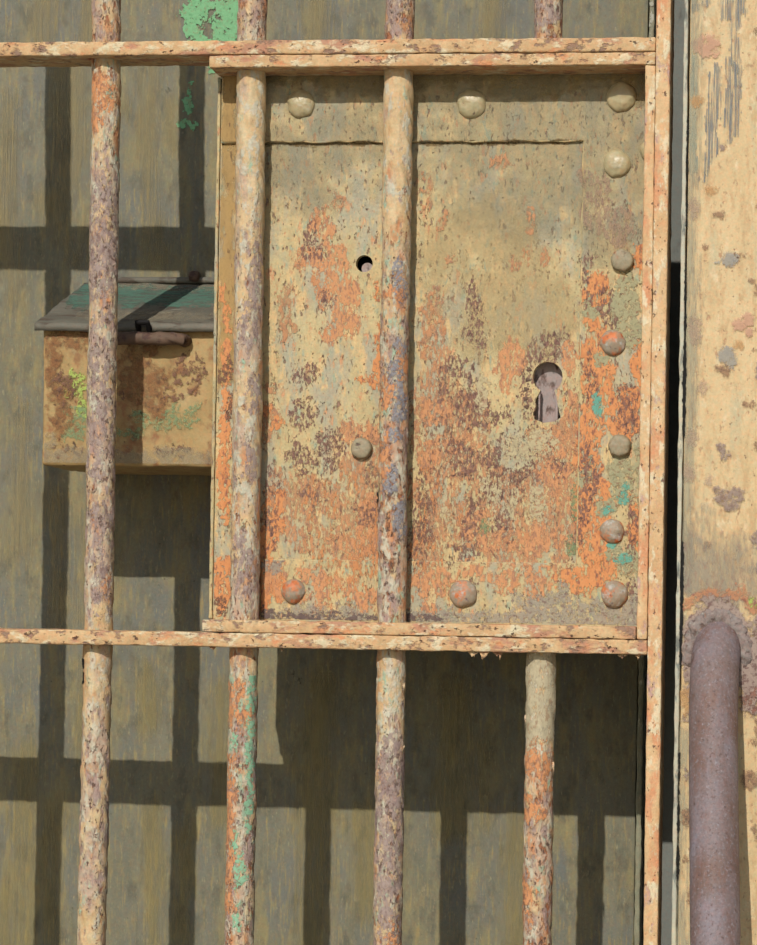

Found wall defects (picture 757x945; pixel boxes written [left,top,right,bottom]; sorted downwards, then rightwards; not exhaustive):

peeling [176,0,238,41]
corrosion [632,243,643,276]
corrosion [44,72,641,622]
corrosion [681,583,757,746]